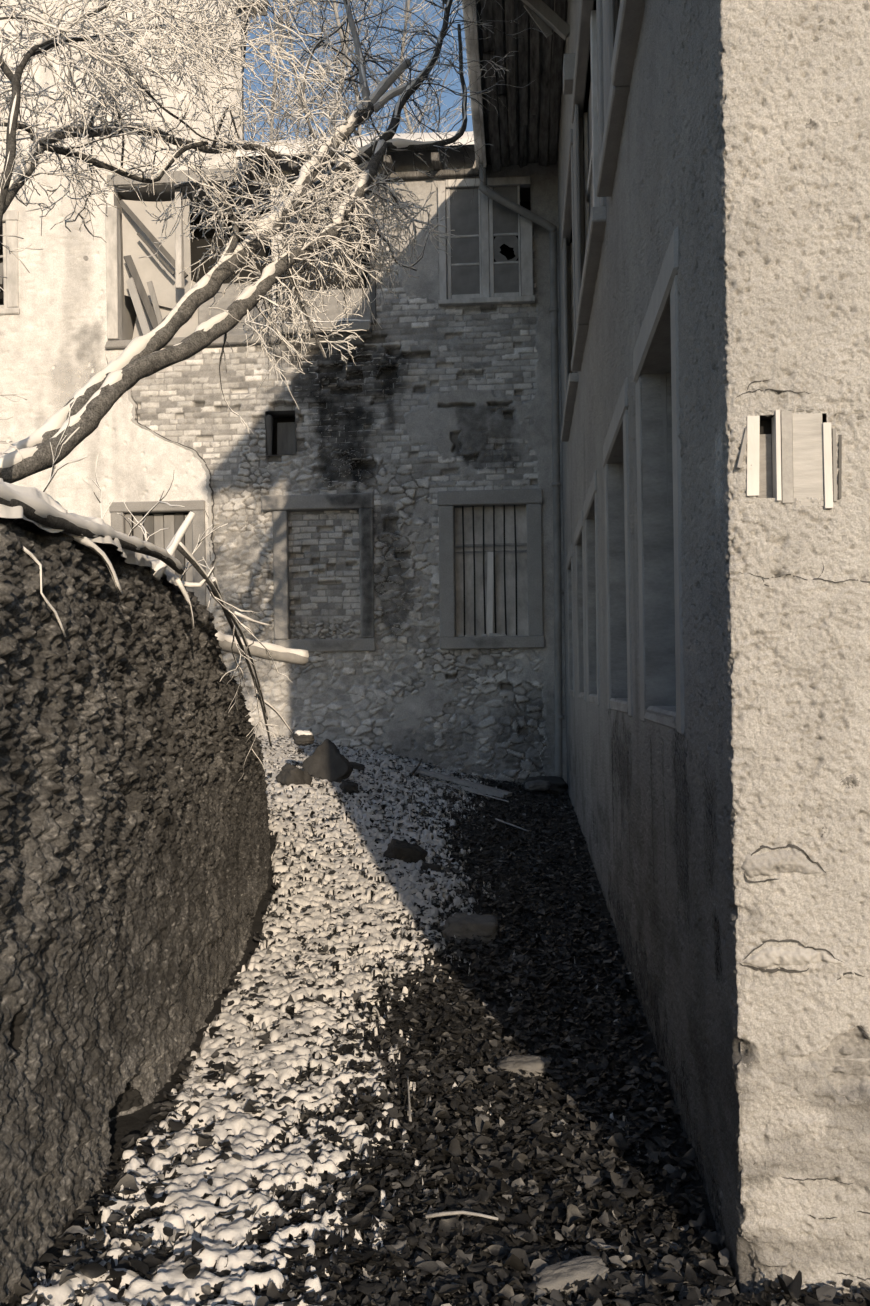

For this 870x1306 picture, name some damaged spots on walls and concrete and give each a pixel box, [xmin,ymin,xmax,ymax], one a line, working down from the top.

leakage [285,337,407,634]
flaking render [806,1026,870,1103]